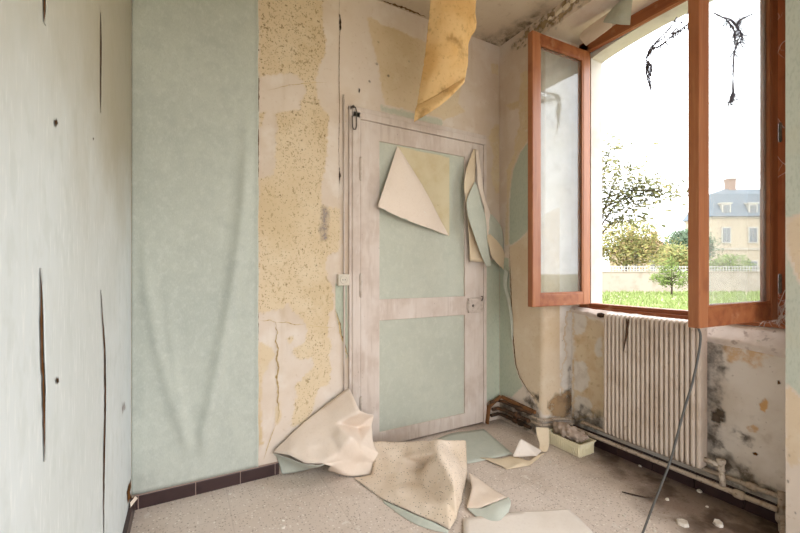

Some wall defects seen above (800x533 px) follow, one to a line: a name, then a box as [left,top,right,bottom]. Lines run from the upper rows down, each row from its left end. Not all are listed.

peeling [365,14,426,112]
peeling [258,0,343,429]
peeling [396,145,450,238]
crack [265,320,331,454]
leakage [548,317,604,427]
leakage [707,388,725,446]
leakage [713,455,758,485]